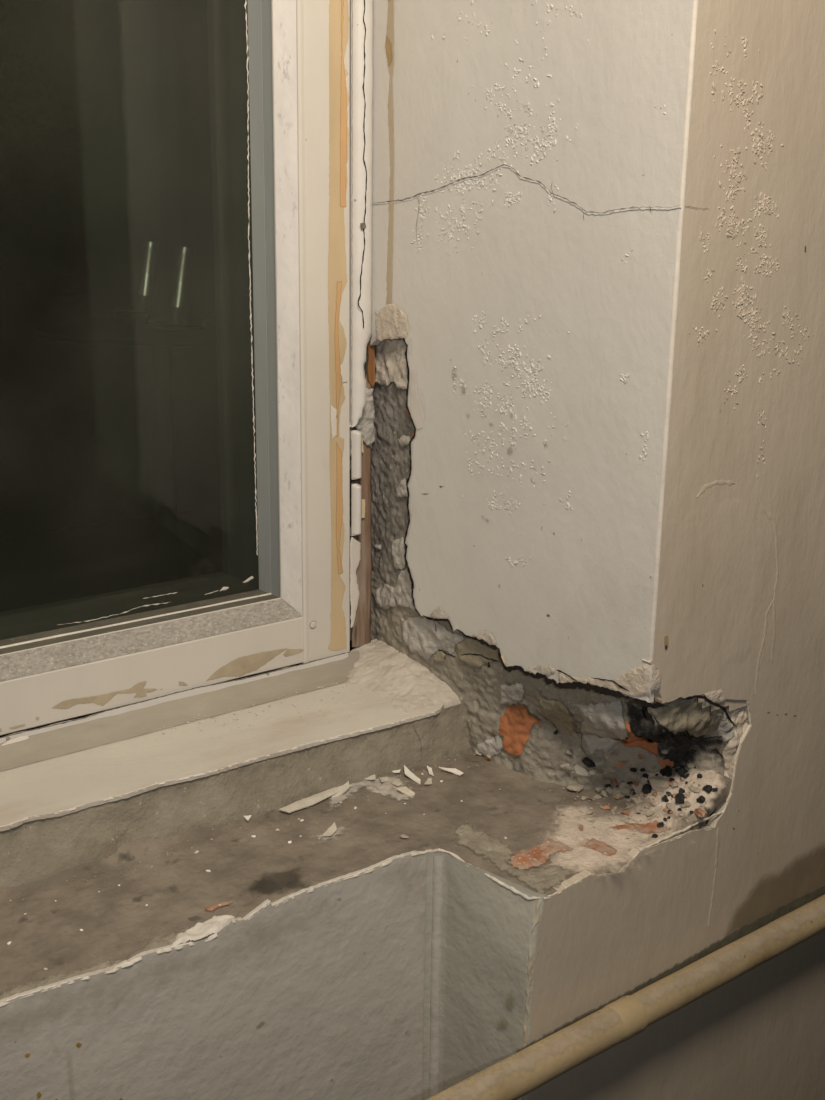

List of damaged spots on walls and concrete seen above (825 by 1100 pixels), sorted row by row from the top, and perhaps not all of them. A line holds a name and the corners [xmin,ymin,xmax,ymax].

crack [358,0,710,328]
spalling [0,0,752,920]
crack [403,338,736,759]
spalling [0,901,236,1007]